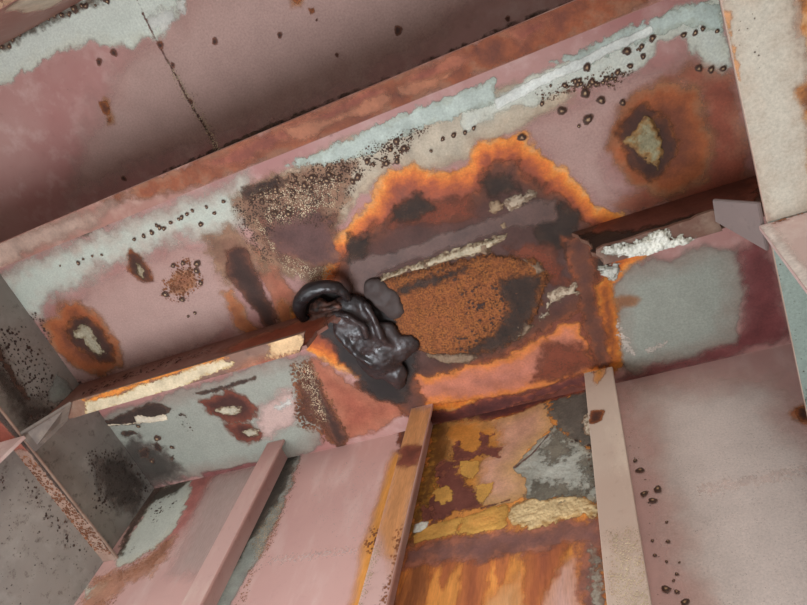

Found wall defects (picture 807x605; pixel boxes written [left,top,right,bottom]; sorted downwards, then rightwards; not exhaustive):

peeling [0,0,186,85]
corrosion [99,100,113,123]
crack [137,0,220,151]
corrosion [102,0,648,203]
corrosion [792,0,807,61]
corrosion [161,63,759,605]
peeling [413,391,598,544]
corrosion [83,536,175,605]